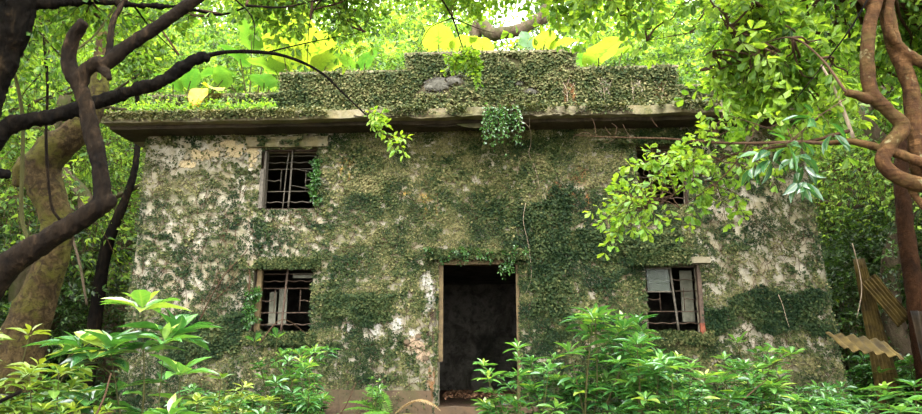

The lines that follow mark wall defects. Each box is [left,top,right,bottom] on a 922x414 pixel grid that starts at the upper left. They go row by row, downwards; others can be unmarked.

peeling [421,274,436,309]
spalling [367,317,430,364]